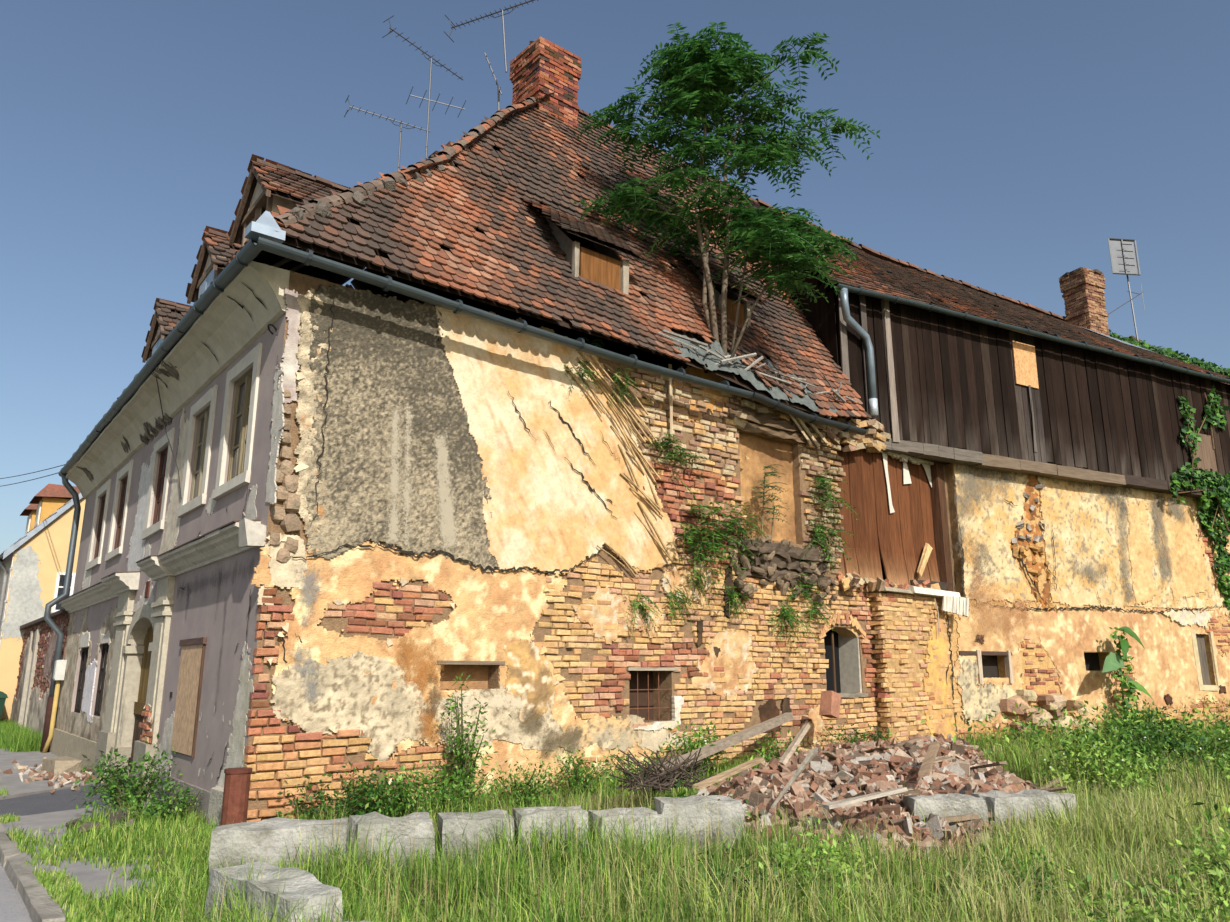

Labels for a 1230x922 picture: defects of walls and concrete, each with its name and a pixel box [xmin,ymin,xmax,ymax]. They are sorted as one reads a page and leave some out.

peeling [1,546,45,641]
peeling [55,604,117,742]
peeling [81,543,92,590]
peeling [126,408,189,614]
crack [311,298,335,524]
spalling [198,588,455,822]
spalling [324,577,455,647]
crack [290,543,640,576]
crack [508,391,620,518]
spalling [531,365,879,770]
spalling [1010,475,1053,611]
crack [946,522,1227,738]